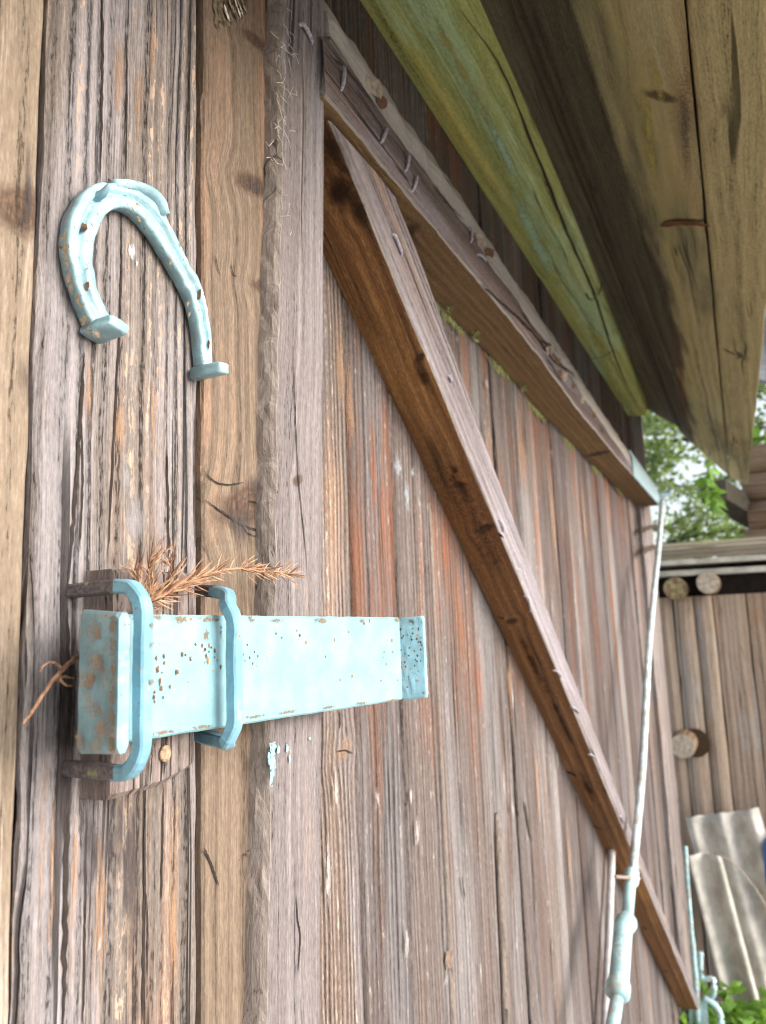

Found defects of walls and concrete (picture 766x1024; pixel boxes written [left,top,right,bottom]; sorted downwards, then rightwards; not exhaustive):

crack [185,22,193,163]
crack [460,10,626,387]
crack [166,402,256,557]
peeling [268,742,291,787]
crack [204,848,219,886]